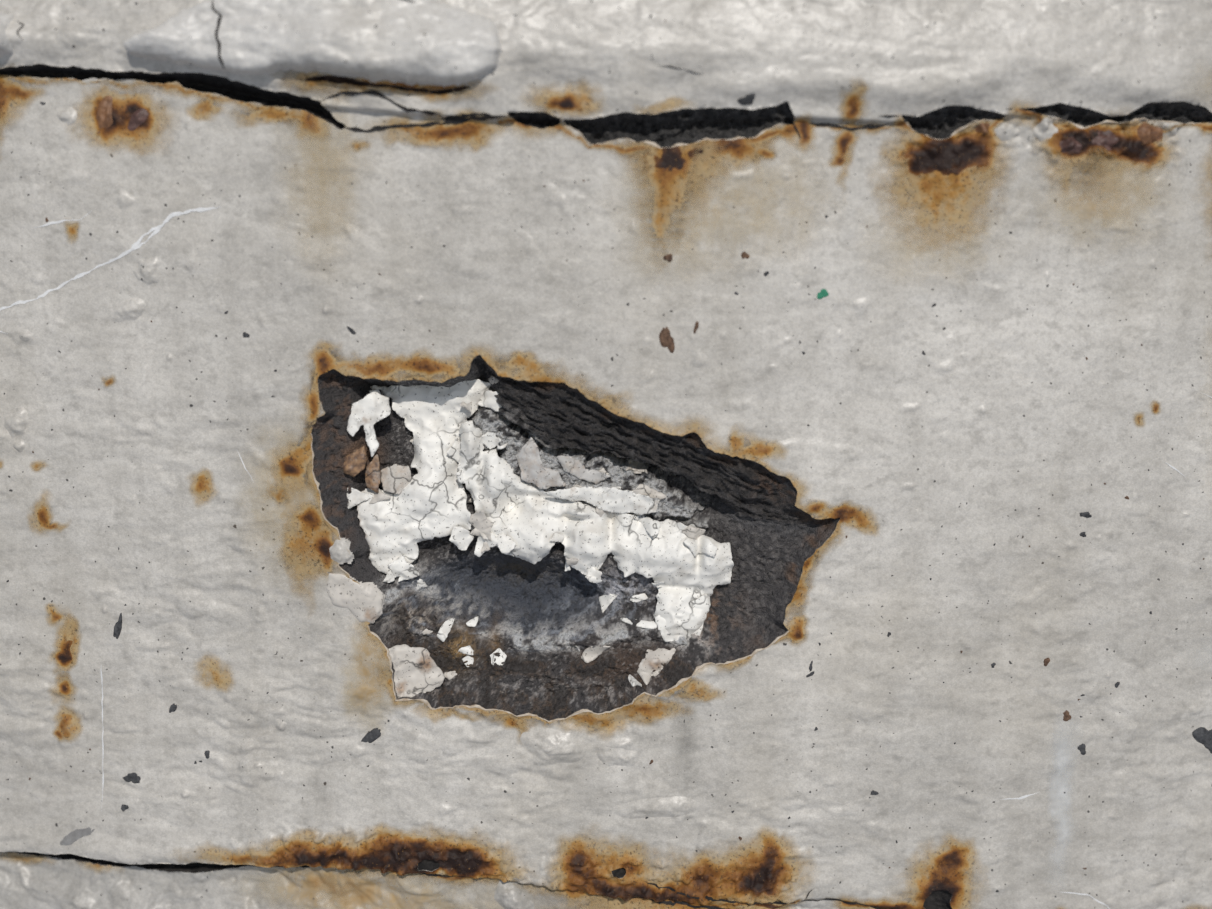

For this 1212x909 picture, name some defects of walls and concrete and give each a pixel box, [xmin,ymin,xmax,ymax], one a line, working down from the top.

rust [0,75,326,149]
crack [0,0,1212,148]
rust [388,85,1212,244]
rust [271,343,877,644]
spalling [311,355,840,722]
rust [47,604,81,740]
crack [2,852,309,873]
rust [199,826,520,883]
crack [419,872,489,880]
rust [545,831,801,909]
crack [634,882,889,909]
rust [839,838,975,909]